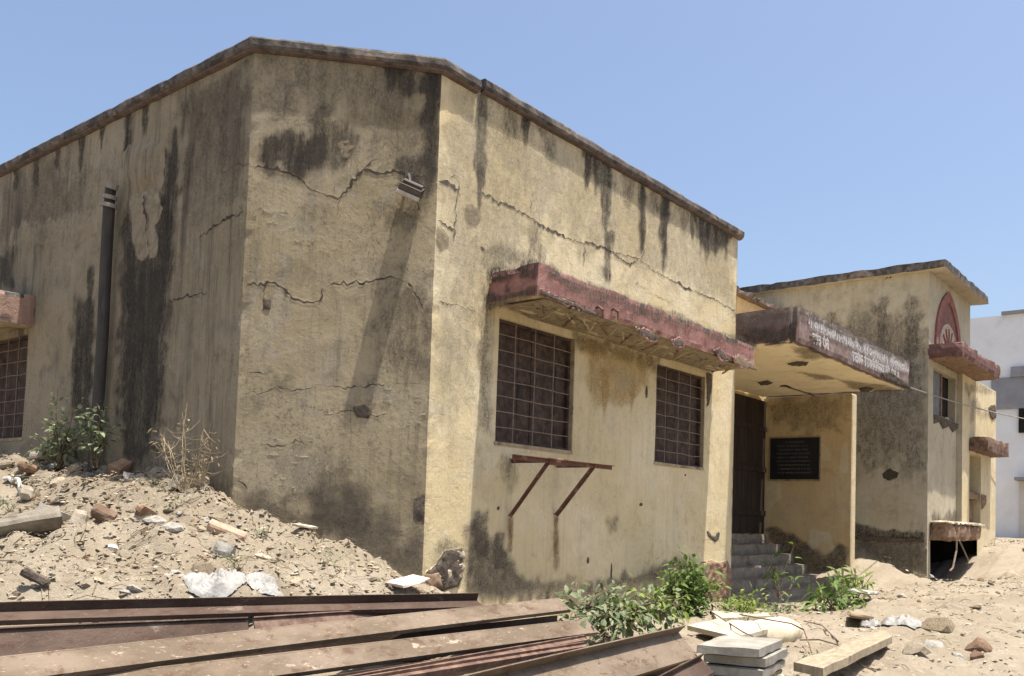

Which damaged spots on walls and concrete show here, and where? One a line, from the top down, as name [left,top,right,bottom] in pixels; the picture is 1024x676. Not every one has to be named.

leakage [259,106,359,179]
leakage [474,89,487,206]
leakage [69,267,95,427]
flaking render [128,189,163,262]
leakage [115,60,249,477]
crack [196,210,243,241]
crack [247,273,477,335]
crack [220,159,736,311]
spalling [503,288,775,408]
leakage [478,151,927,469]
flaking render [424,547,465,592]
leakage [439,512,702,604]